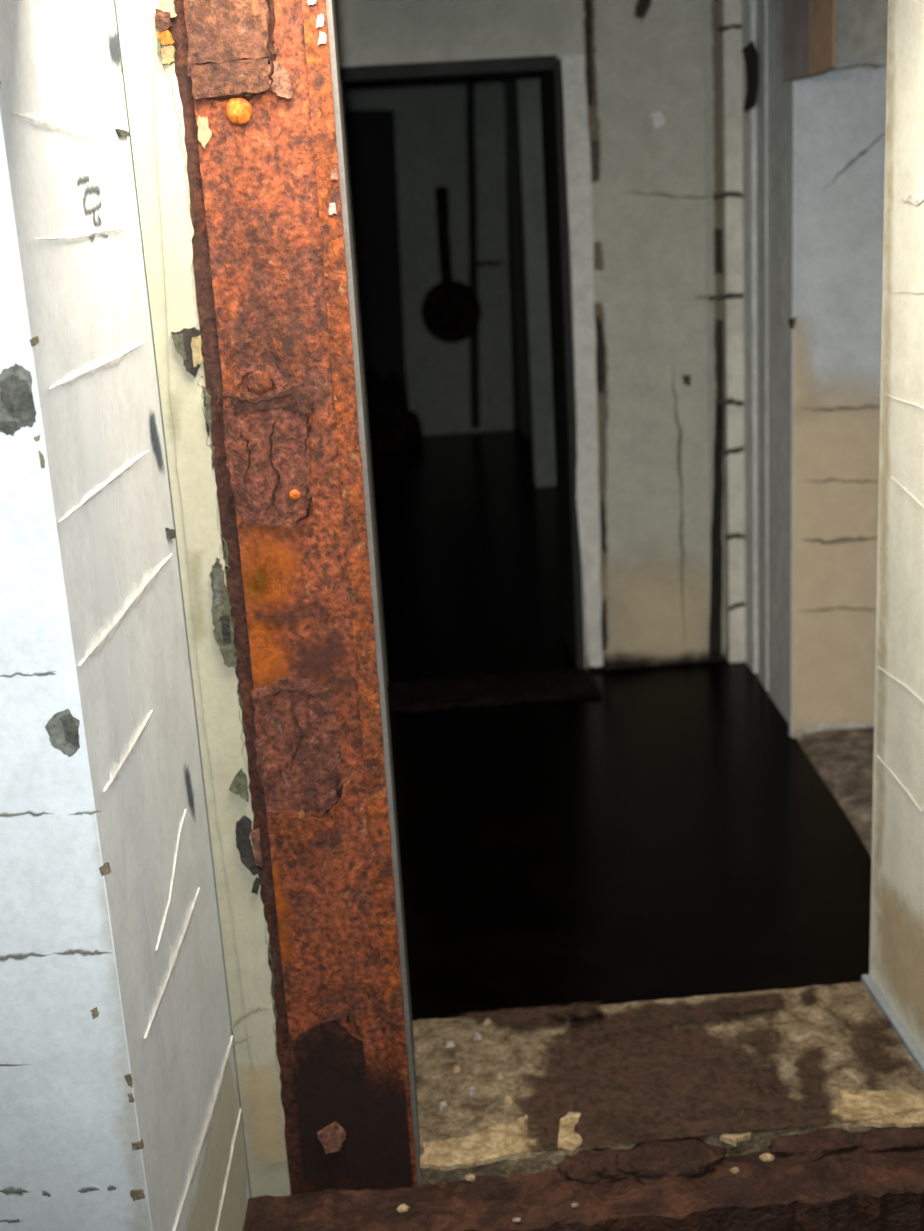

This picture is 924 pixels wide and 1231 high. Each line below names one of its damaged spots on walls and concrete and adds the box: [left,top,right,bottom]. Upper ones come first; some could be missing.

corrosion [268,60,293,99]
corrosion [197,116,212,149]
spalling [0,363,45,469]
corrosion [231,363,315,414]
crack [671,362,724,656]
peeling [150,0,287,1166]
corrosion [242,543,293,605]
corrosion [249,622,287,682]
spalling [45,709,80,757]
corrosion [272,869,289,965]
corrosion [317,1121,346,1154]